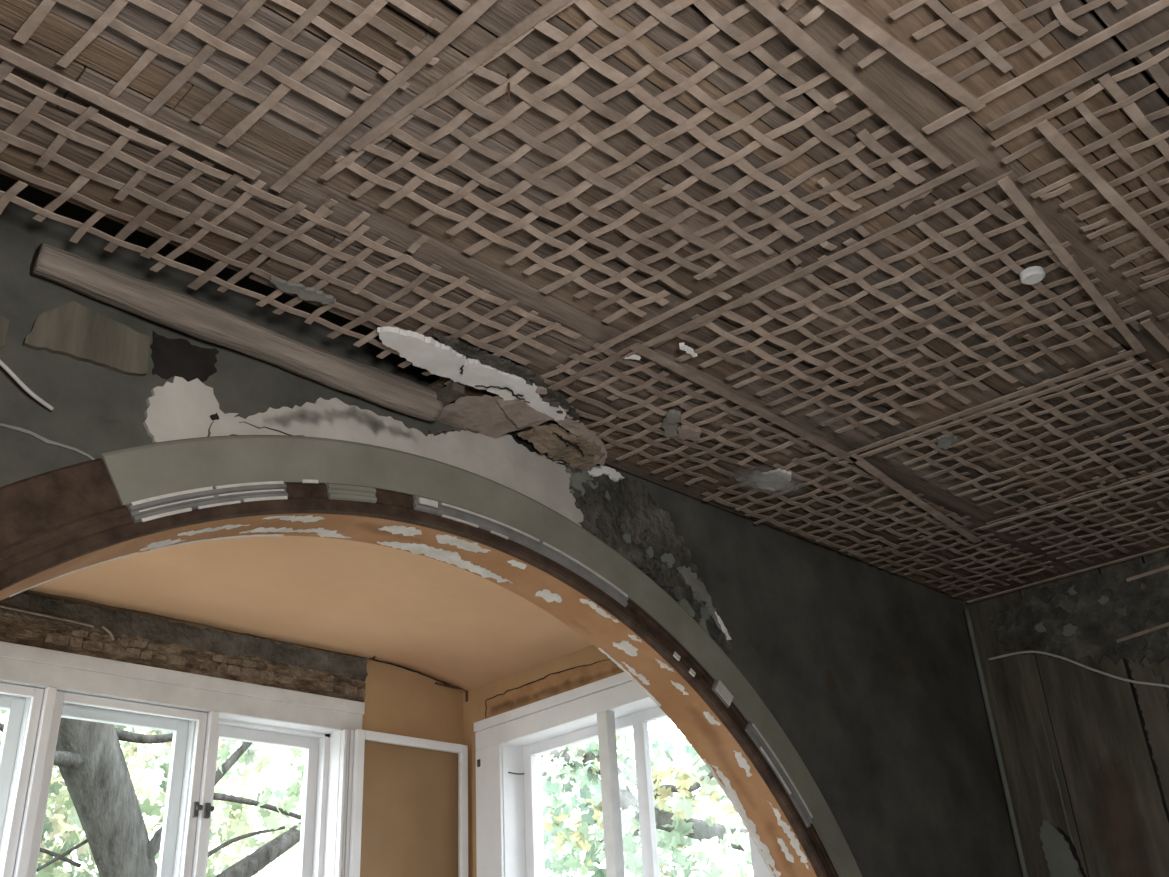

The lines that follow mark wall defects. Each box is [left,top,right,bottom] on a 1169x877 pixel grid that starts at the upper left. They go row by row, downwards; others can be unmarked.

crack [460,365,530,403]
spalling [434,333,580,424]
spalling [508,432,548,456]
spalling [131,481,288,522]
peeling [377,525,513,584]
spalling [419,497,628,597]
spalling [561,460,732,653]
spalling [0,515,368,702]
peeling [598,634,662,706]
peeling [655,652,696,695]
peeling [702,759,810,877]
peeling [1039,820,1083,877]